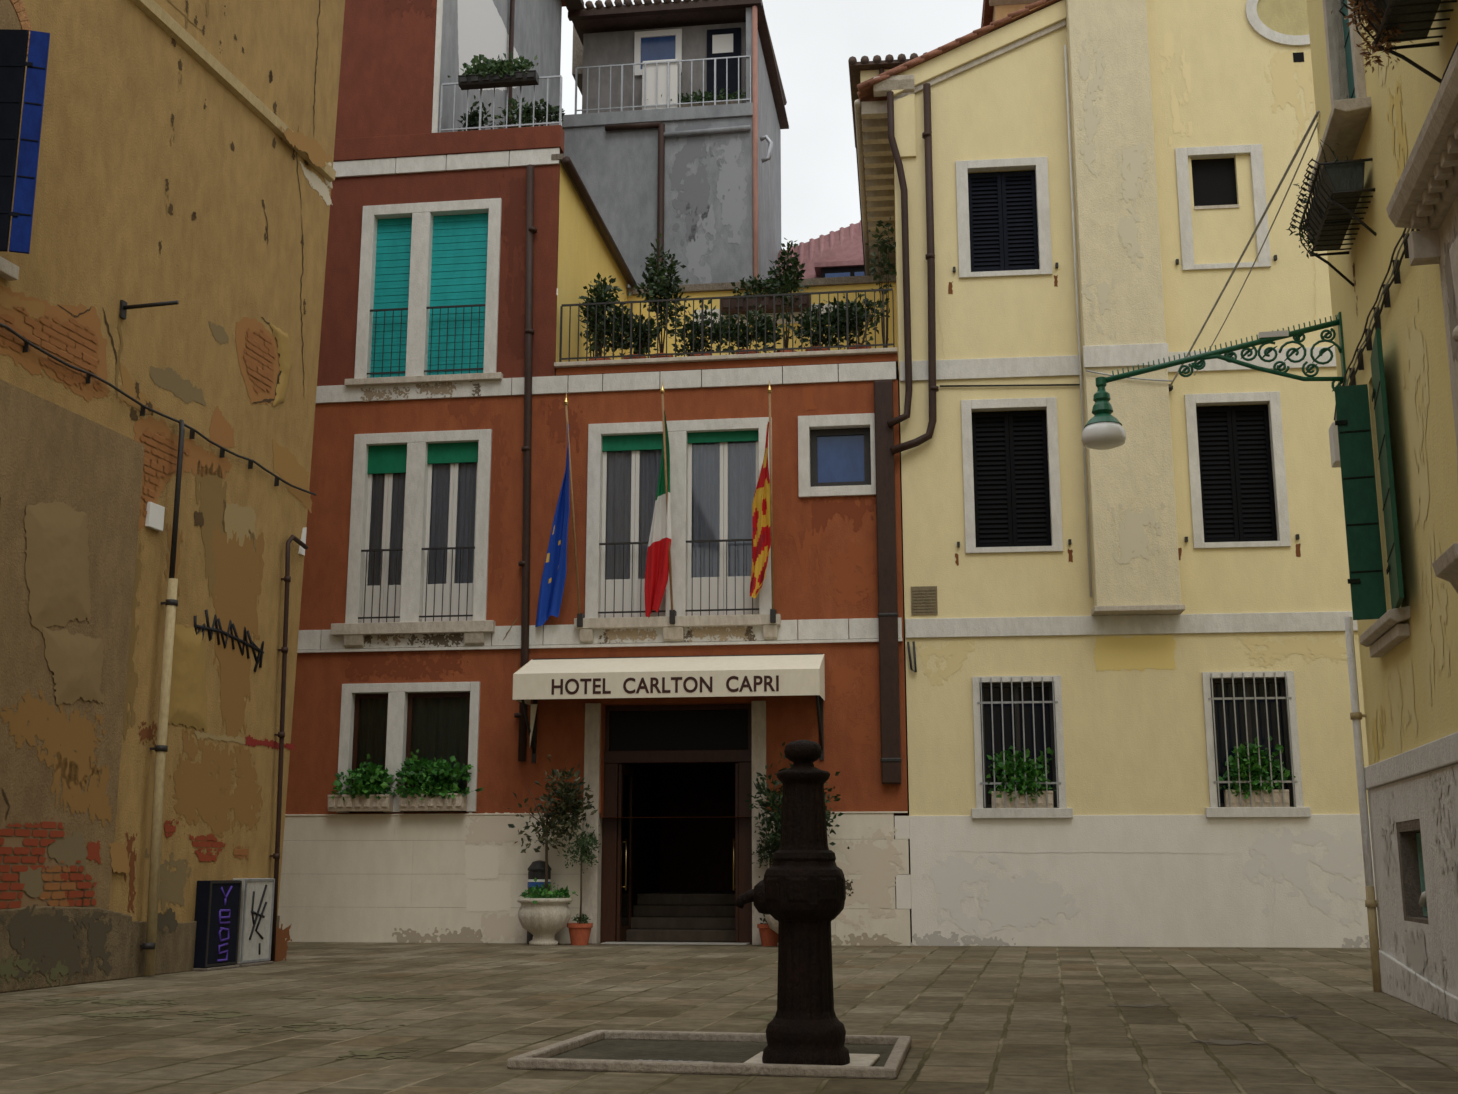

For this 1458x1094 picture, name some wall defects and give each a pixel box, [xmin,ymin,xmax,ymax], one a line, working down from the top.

peeling [0,284,235,530]
flaking render [0,814,129,909]
damp [0,904,112,982]